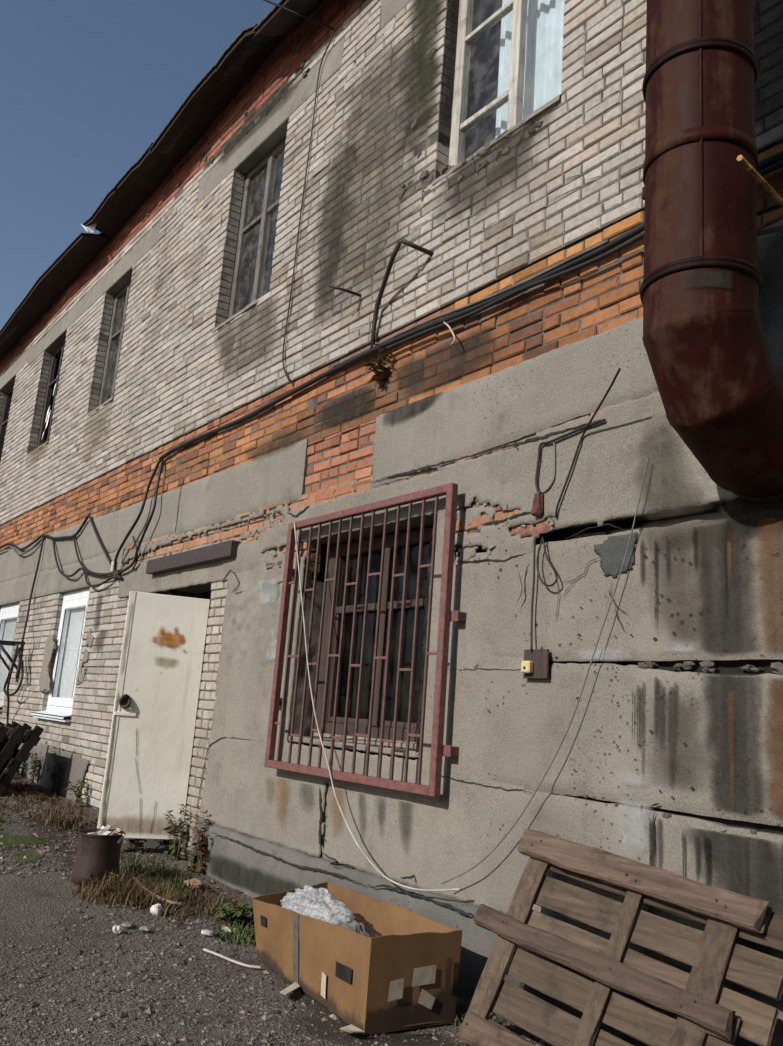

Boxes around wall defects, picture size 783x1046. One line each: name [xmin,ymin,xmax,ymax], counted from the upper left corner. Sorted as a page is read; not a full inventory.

water stain [317,0,460,303]
spalling [397,130,511,215]
spalling [454,503,555,565]
water stain [640,518,754,652]
corrosion [759,517,783,649]
corrosion [152,628,185,662]
water stain [632,678,690,780]
water stain [705,673,761,813]
corrosion [767,678,783,818]
water stain [649,820,662,868]
water stain [682,828,783,915]
water stain [750,941,778,955]